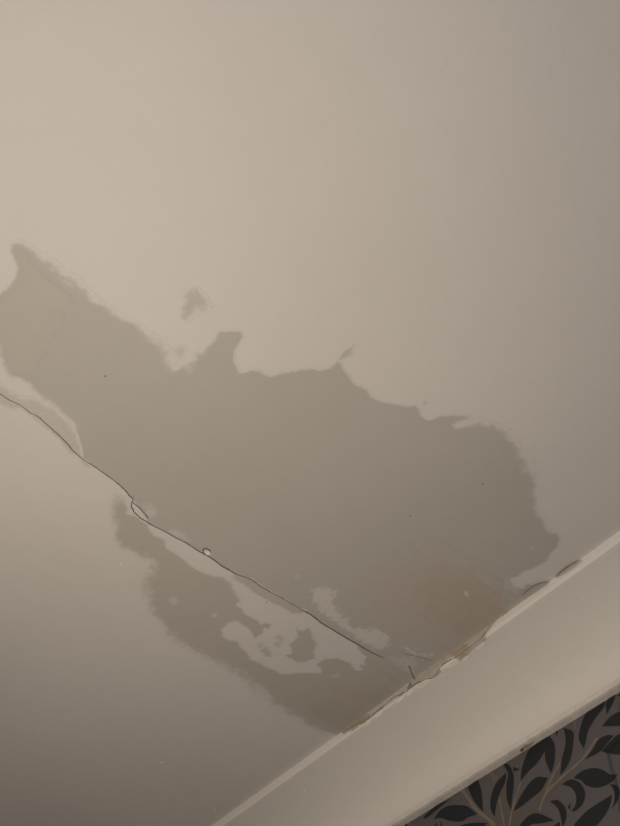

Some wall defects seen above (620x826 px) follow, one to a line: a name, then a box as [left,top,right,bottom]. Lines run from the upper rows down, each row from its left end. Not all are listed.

crack [0,394,383,658]
leakage [0,239,563,737]